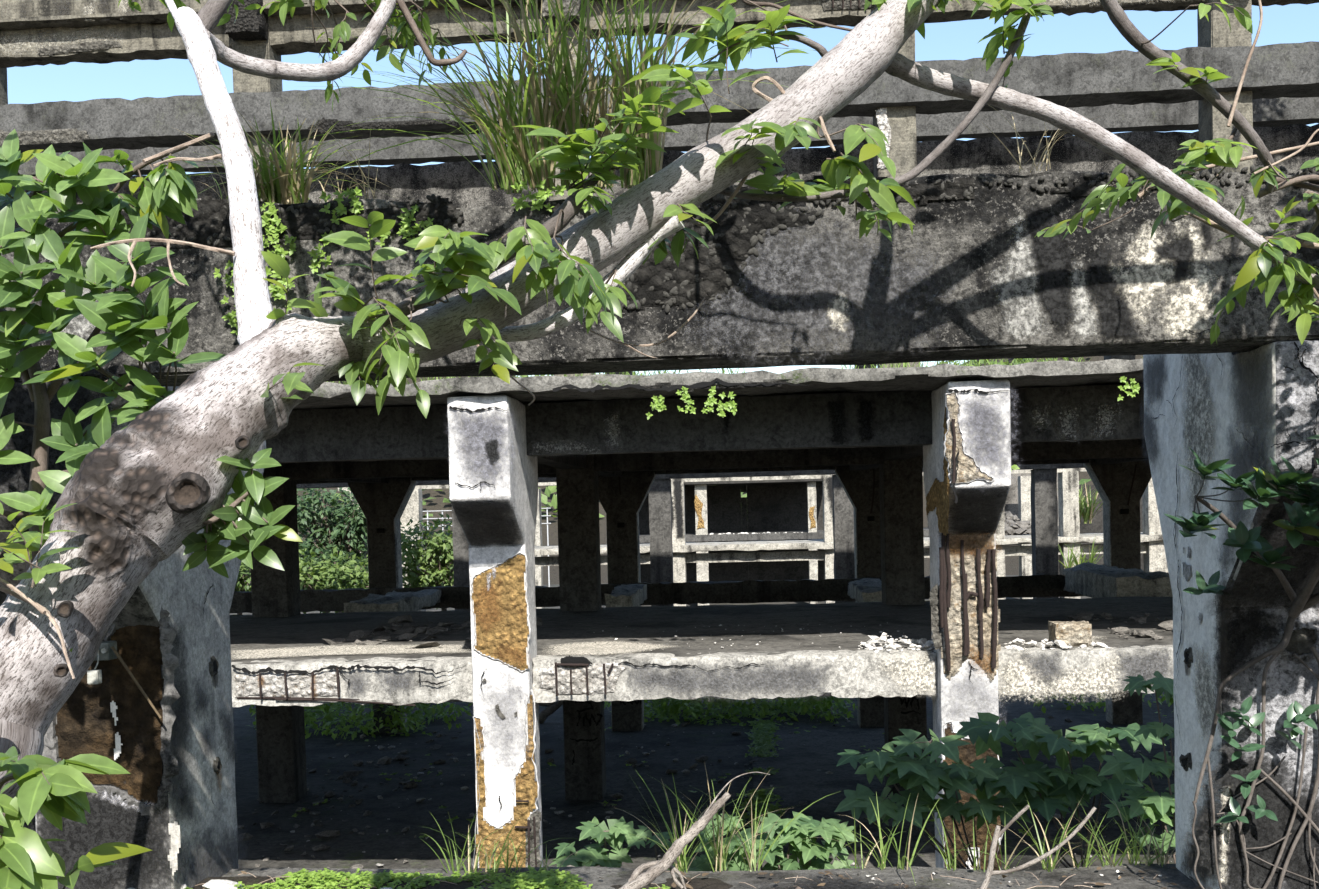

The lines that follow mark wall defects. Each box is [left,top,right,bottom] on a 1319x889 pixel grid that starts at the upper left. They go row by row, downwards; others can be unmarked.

water stain [993,206,1216,340]
water stain [1231,236,1240,262]
crack [1236,342,1319,471]
spalling [926,391,1001,682]
spalling [44,606,181,876]
water stain [231,644,469,659]
spalling [470,552,627,868]
water stain [546,641,672,655]
water stain [1000,349,1319,889]